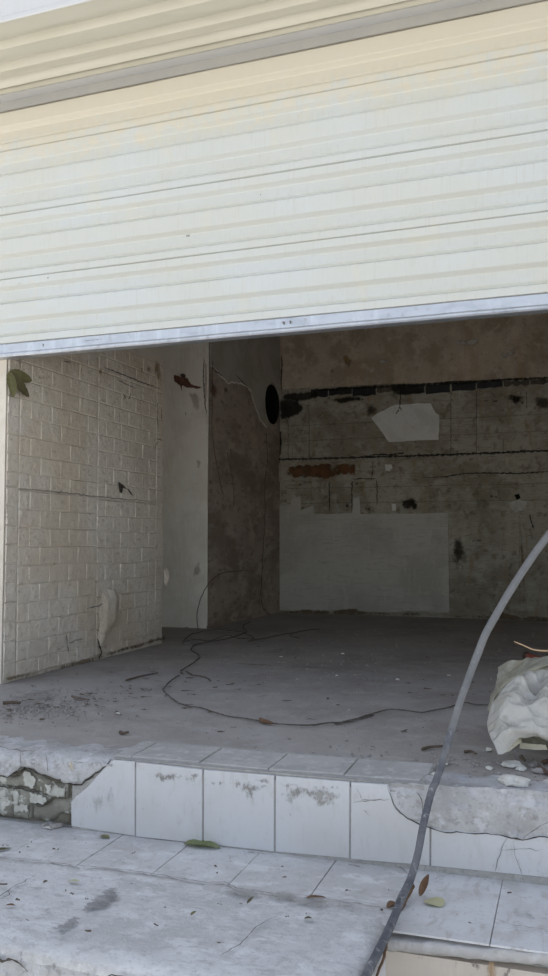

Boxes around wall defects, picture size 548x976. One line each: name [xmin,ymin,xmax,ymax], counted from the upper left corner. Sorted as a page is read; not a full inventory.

spalling [0,768,72,825]
water stain [287,785,334,805]
crack [354,786,548,874]
crack [0,958,28,972]